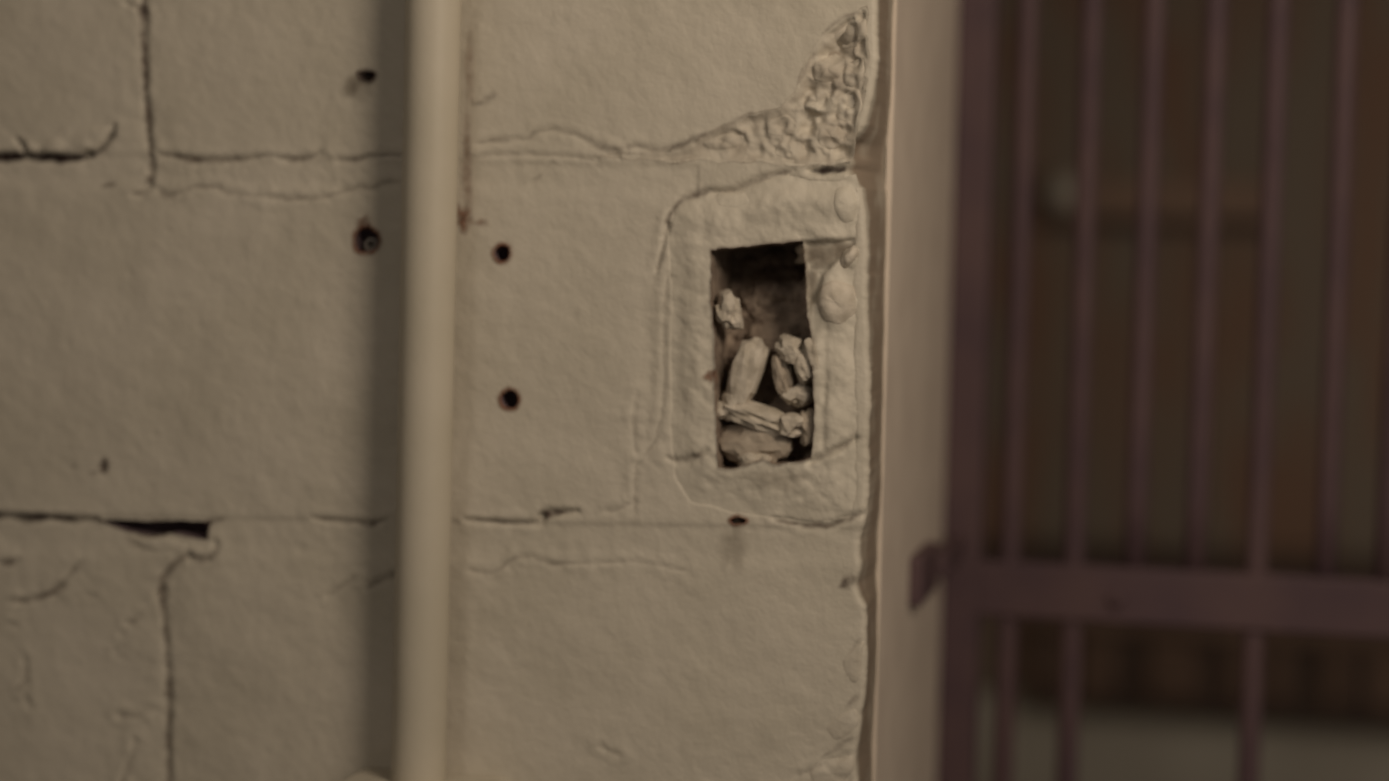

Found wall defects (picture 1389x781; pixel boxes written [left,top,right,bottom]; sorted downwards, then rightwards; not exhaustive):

crack [141,0,151,127]
spalling [594,6,870,167]
crack [0,147,104,163]
crack [818,166,846,174]
spalling [706,241,848,469]
crack [0,513,76,521]